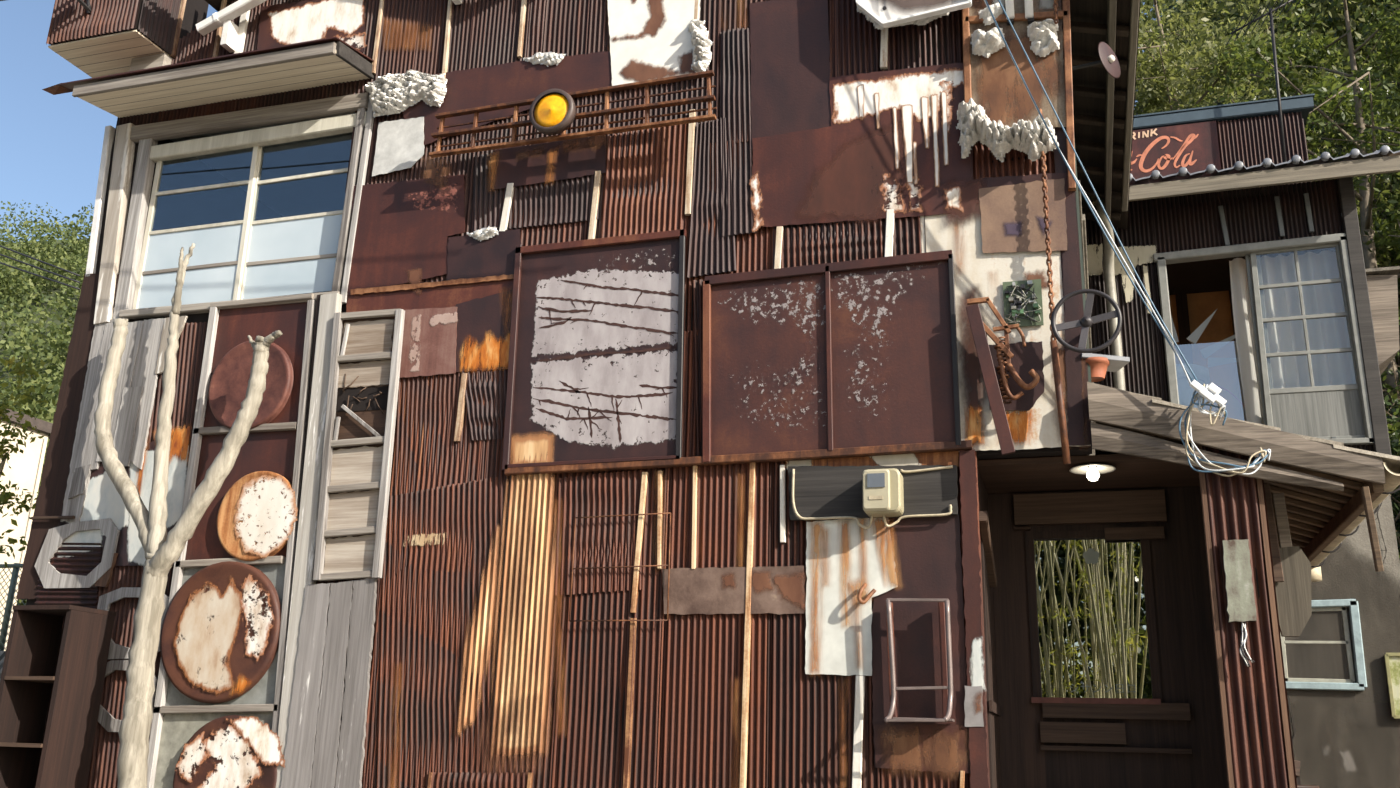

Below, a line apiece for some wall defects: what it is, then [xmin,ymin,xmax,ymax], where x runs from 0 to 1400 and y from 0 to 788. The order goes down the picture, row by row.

peeling [831,67,964,134]
peeling [879,173,924,214]
corrosion [460,333,510,371]
peeling [530,249,679,449]
corrosion [960,289,986,444]
corrosion [1006,410,1032,443]
peeling [233,475,298,558]
peeling [173,573,274,695]
corrosion [458,433,555,757]
corrosion [722,519,898,672]
peeling [175,715,285,788]
corrosion [882,729,961,775]